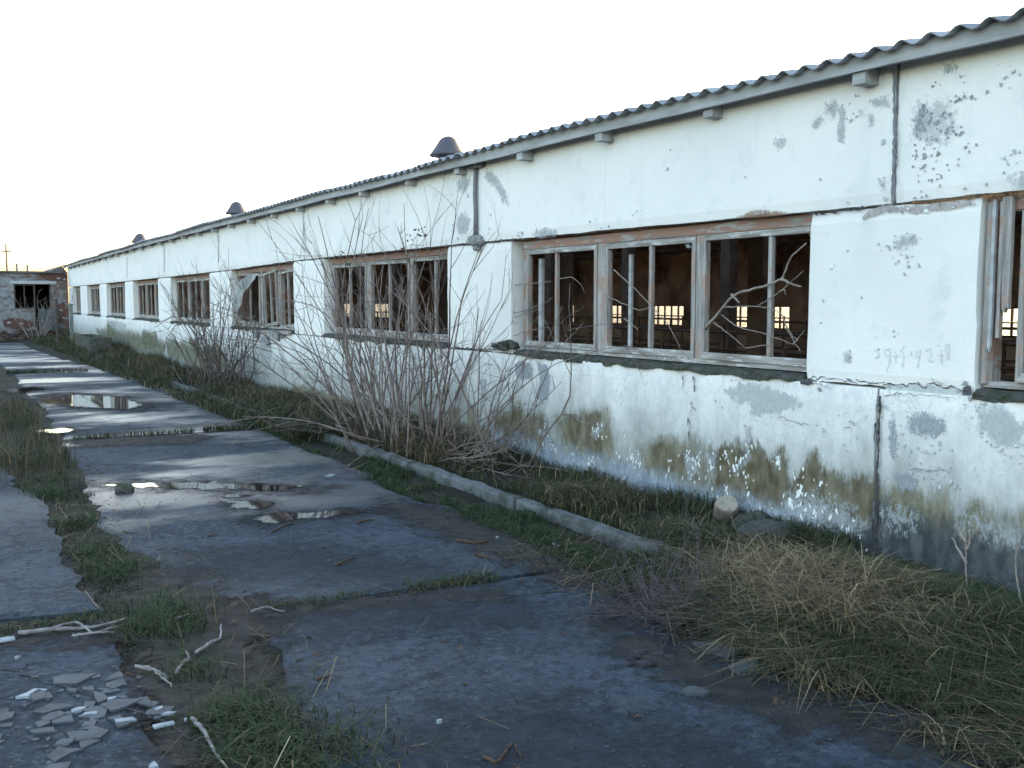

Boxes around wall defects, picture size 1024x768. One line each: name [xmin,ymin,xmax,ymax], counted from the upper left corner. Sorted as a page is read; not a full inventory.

peeling [485,172,508,205]
peeling [812,94,888,144]
spalling [862,56,1020,220]
peeling [665,379,801,498]
water stain [450,404,1024,596]
crack [803,376,966,557]
peeling [880,405,961,492]
peeling [957,381,1024,464]